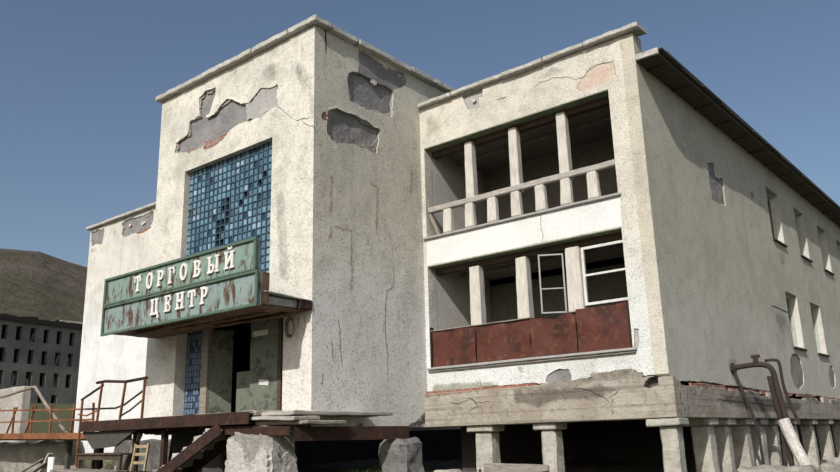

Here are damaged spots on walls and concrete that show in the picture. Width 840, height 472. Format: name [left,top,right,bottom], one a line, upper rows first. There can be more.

crack [534,61,621,87]
flaking render [576,63,615,91]
flaking render [175,83,278,153]
flaking render [321,50,406,153]
flaking render [707,162,725,205]
flaking render [122,211,154,237]
crack [383,269,394,366]
spalling [427,366,661,397]